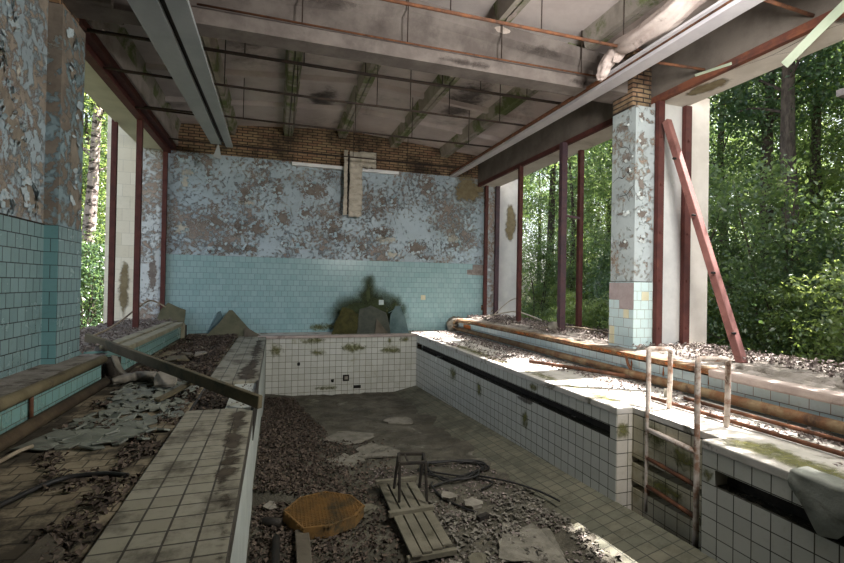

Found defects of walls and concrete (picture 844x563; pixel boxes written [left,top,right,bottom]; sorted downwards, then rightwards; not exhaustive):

peeling [66,27,78,49]
peeling [70,99,83,216]
peeling [616,112,647,219]
peeling [0,167,40,216]
peeling [204,160,436,262]
water stain [505,205,516,241]
peeling [618,235,646,251]
water stain [119,262,129,312]
peeling [147,258,157,292]